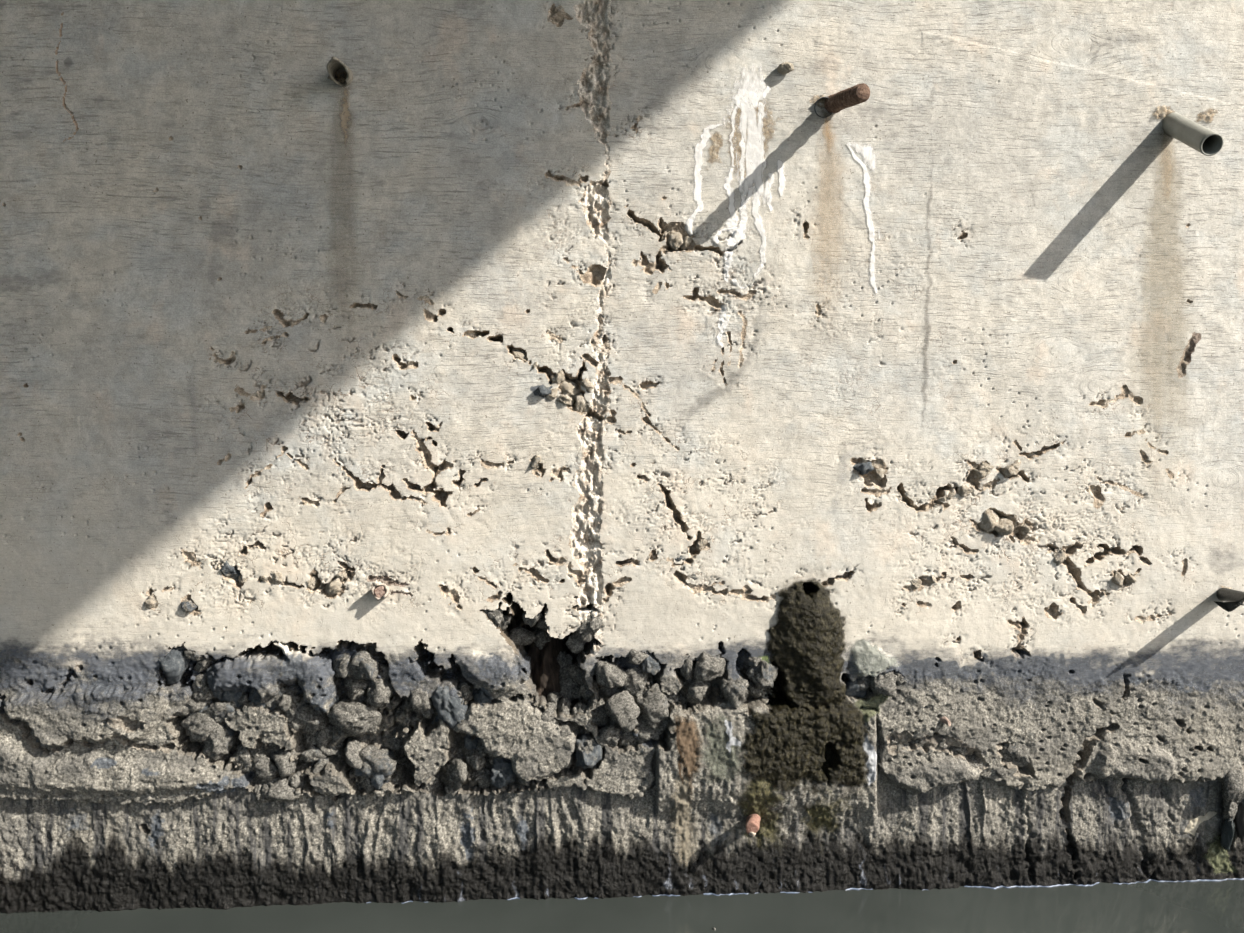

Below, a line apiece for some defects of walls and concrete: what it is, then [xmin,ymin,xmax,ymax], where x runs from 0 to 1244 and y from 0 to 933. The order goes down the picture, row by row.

crack [261,332,290,344]
crack [319,0,776,659]
crack [217,422,481,517]
spalling [850,457,892,498]
spalling [969,507,1042,545]
spalling [1044,596,1087,621]
leakage [0,641,532,716]
spalling [157,557,778,804]
leakage [841,639,1244,700]
leakage [863,734,877,786]
crack [1059,674,1131,843]
leakage [0,811,1244,914]